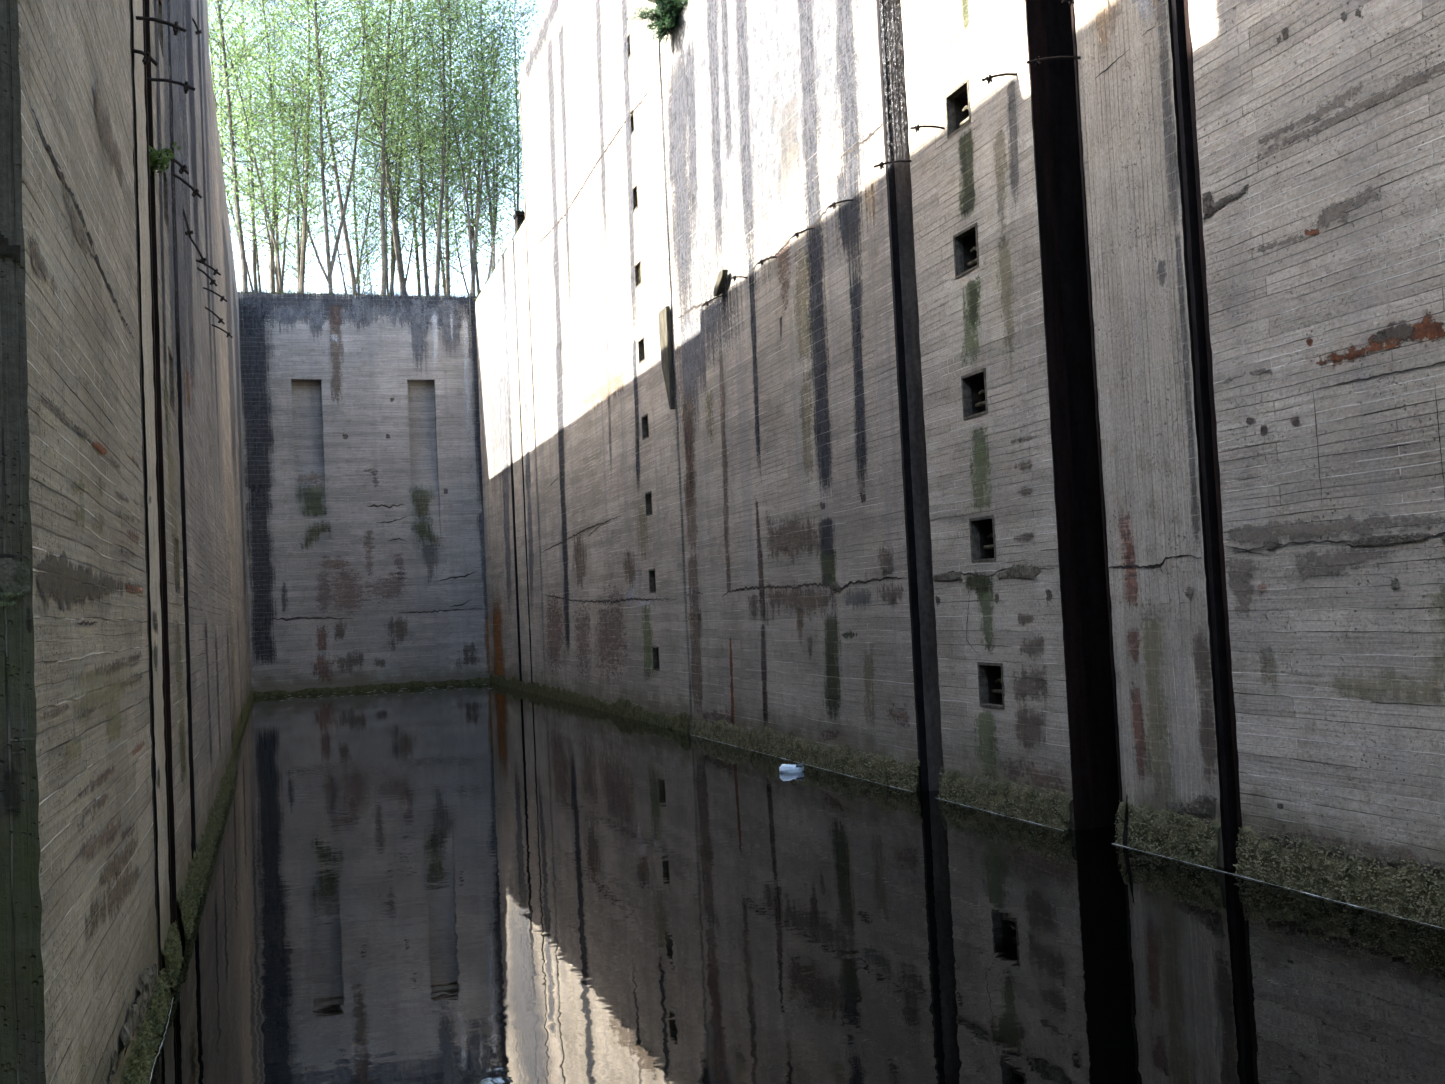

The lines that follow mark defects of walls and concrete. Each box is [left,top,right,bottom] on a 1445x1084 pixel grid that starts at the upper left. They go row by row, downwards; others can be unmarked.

damp [721,0,731,156]
damp [686,43,698,221]
damp [162,0,218,429]
damp [806,172,816,282]
damp [837,173,849,250]
damp [776,240,791,337]
damp [969,284,977,328]
corrosion [1306,312,1445,368]
damp [215,274,277,752]
corrosion [485,586,505,676]
crack [542,577,904,604]